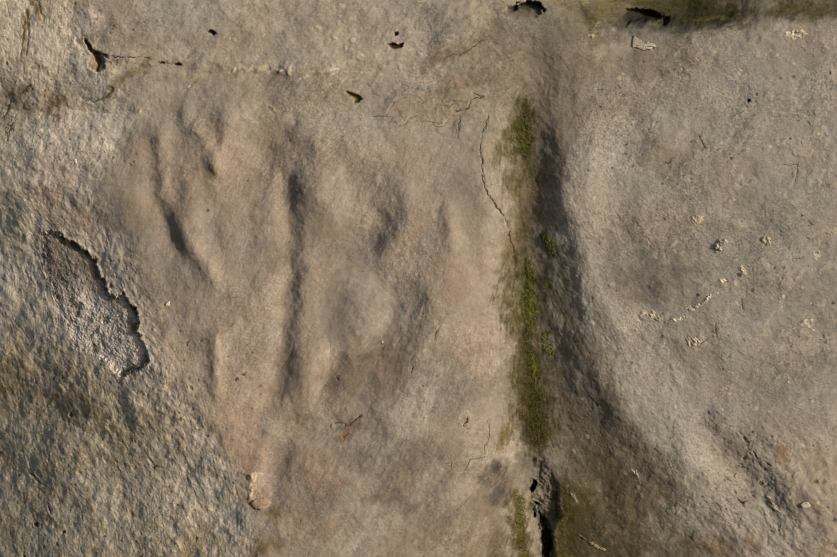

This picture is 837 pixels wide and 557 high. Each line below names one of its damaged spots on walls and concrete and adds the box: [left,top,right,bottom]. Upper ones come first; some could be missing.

crack [480,118,517,301]
spalling [40,231,149,378]
crack [529,480,553,557]